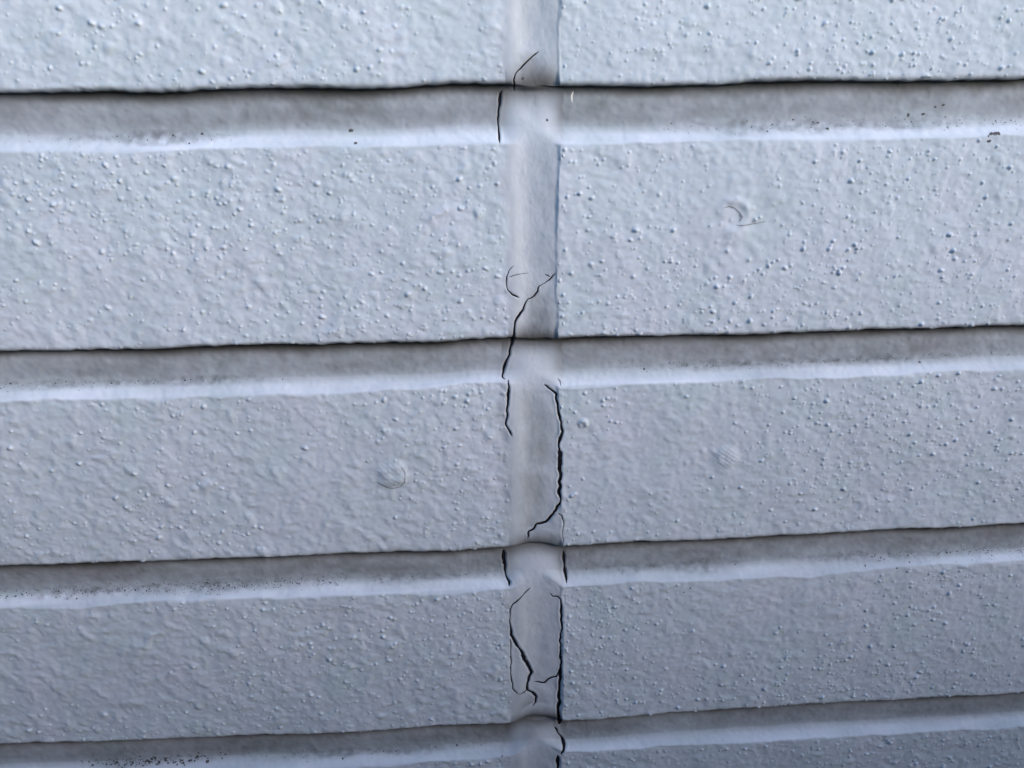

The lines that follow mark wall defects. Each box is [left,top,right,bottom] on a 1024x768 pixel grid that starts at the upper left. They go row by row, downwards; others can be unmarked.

crack [497,51,539,143]
crack [502,268,556,436]
crack [501,378,567,768]